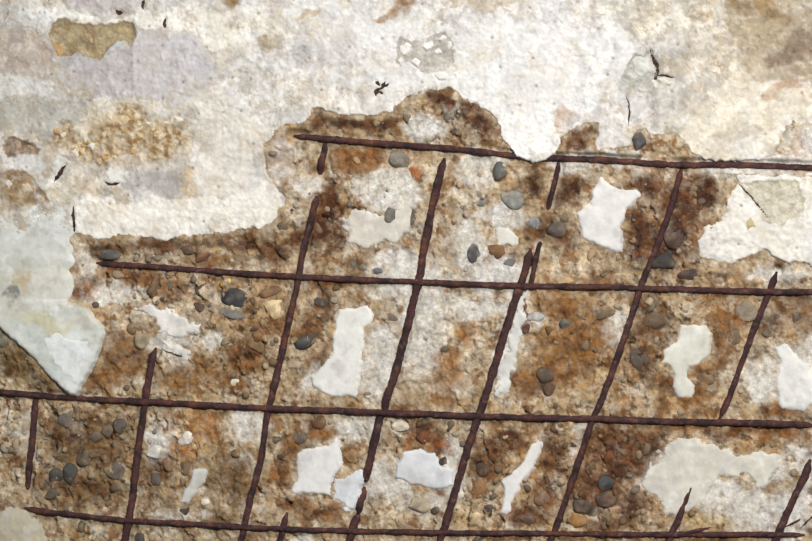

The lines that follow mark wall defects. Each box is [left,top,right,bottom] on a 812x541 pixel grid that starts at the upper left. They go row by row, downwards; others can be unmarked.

peeling [49,18,136,59]
peeling [3,137,39,157]
rust [312,117,400,172]
peeling [1,169,48,204]
rust [89,237,181,256]
rust [208,185,346,263]
spalling [50,87,812,424]
rust [558,174,582,201]
rust [633,177,715,238]
spalling [0,329,812,541]
rust [474,430,526,478]
rust [508,432,565,527]